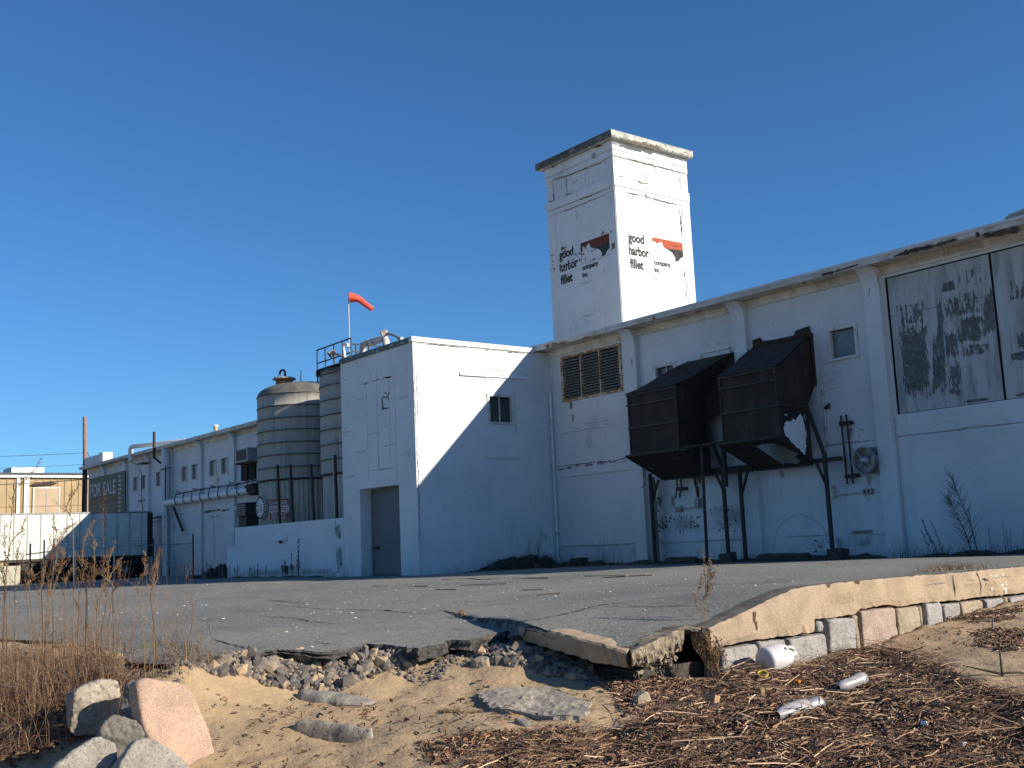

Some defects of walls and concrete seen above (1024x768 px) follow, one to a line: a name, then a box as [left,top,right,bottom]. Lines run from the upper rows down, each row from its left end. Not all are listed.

spalling [975,227,1022,238]
spalling [894,238,957,257]
peeling [896,267,995,403]
peeling [1011,333,1024,361]
peeling [784,414,807,455]